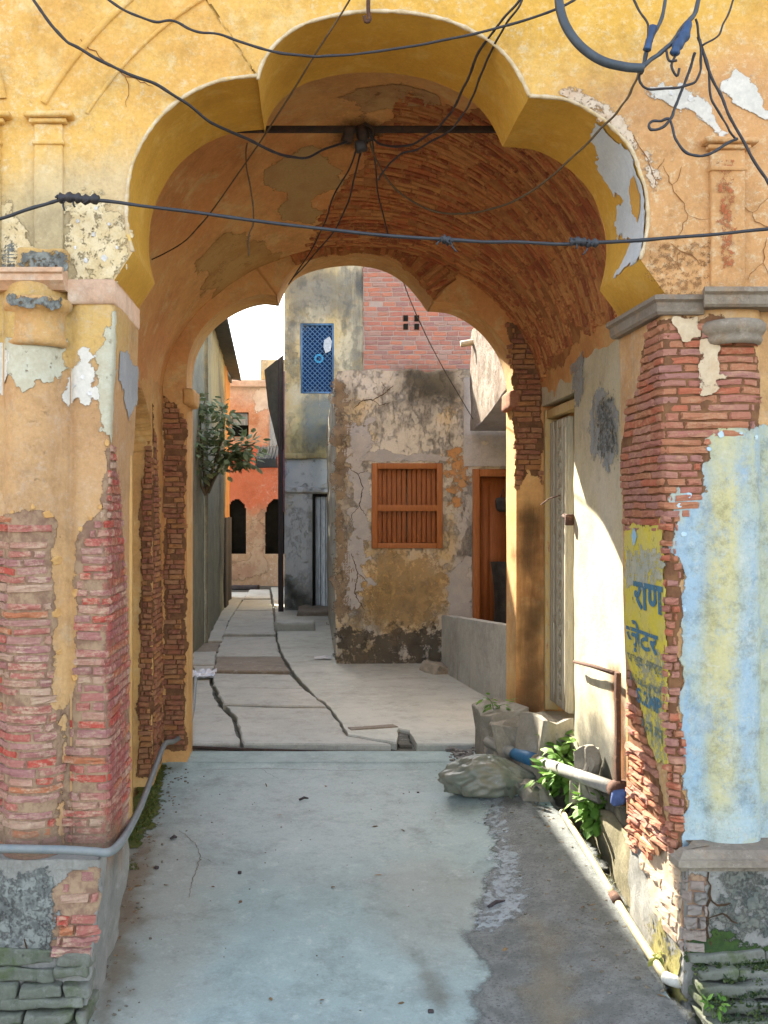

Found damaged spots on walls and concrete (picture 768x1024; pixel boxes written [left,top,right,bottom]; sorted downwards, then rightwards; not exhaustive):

peeling [720,68,768,120]
flaking render [1,198,34,267]
flaking render [64,188,134,282]
crack [633,135,704,270]
crack [745,198,768,279]
water stain [597,396,617,459]
flaking render [285,82,768,953]
flaking render [0,311,189,858]
water stain [326,621,442,664]
flaking render [50,867,102,958]
water stain [706,871,768,944]